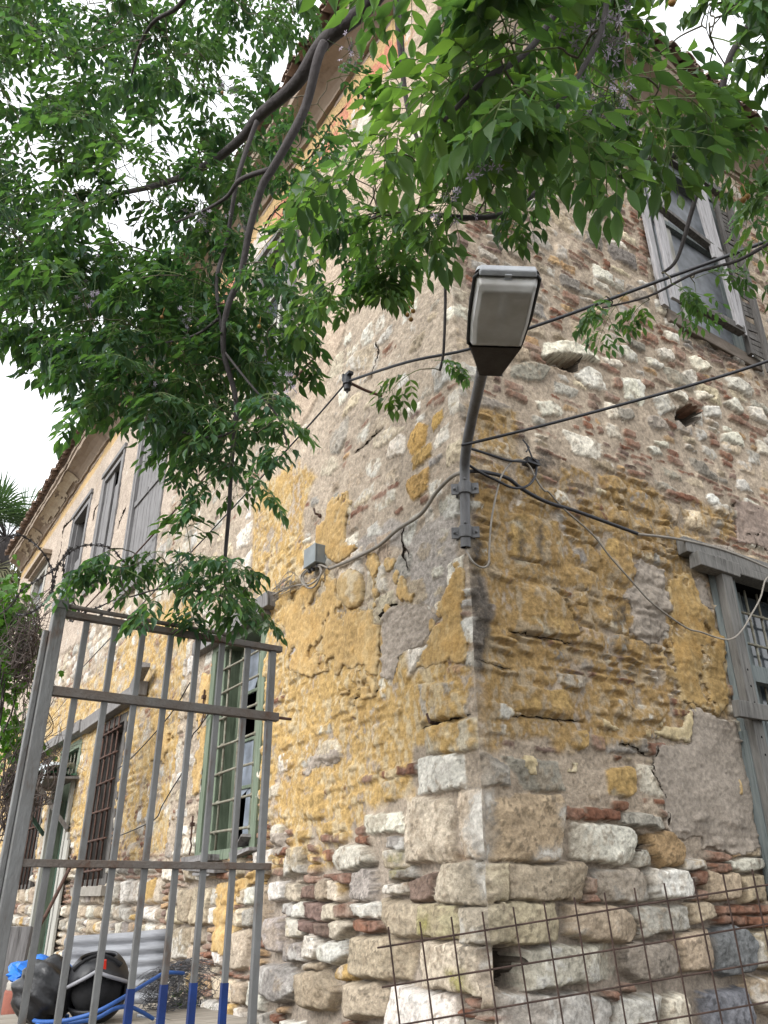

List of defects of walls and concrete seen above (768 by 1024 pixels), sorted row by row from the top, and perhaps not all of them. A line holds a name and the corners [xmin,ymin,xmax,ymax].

hole [674,411,702,427]
crack [401,528,409,571]
peeling [282,491,469,700]
crack [423,714,471,729]
crack [512,715,581,725]
peeling [522,755,538,775]
crack [621,743,671,826]